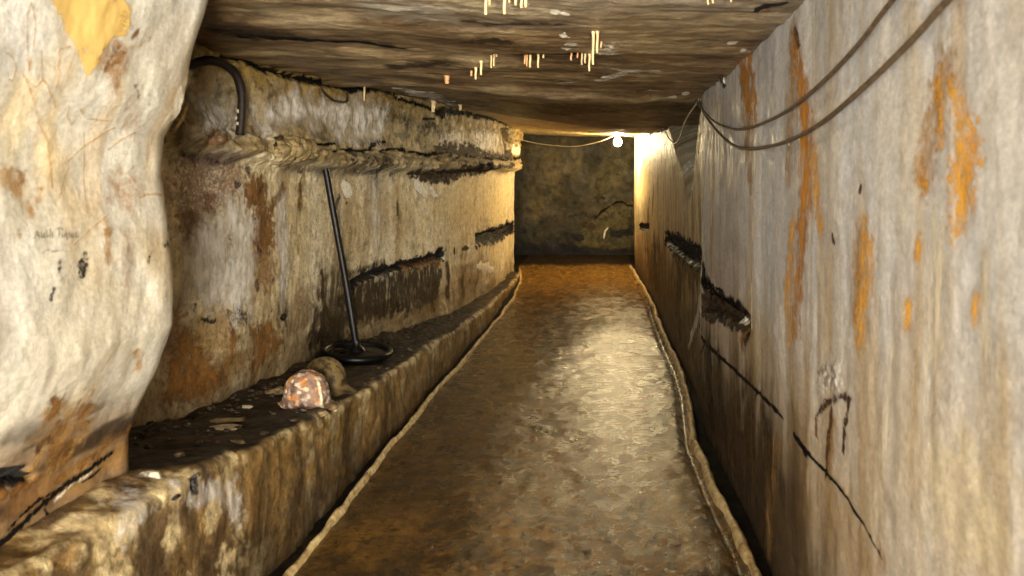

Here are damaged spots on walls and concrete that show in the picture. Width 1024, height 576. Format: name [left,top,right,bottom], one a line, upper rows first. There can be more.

corrosion [739,54,757,182]
corrosion [785,24,822,338]
corrosion [917,56,982,243]
spalling [344,219,514,296]
spalling [664,228,751,350]
corrosion [855,216,873,349]
crack [699,324,882,559]